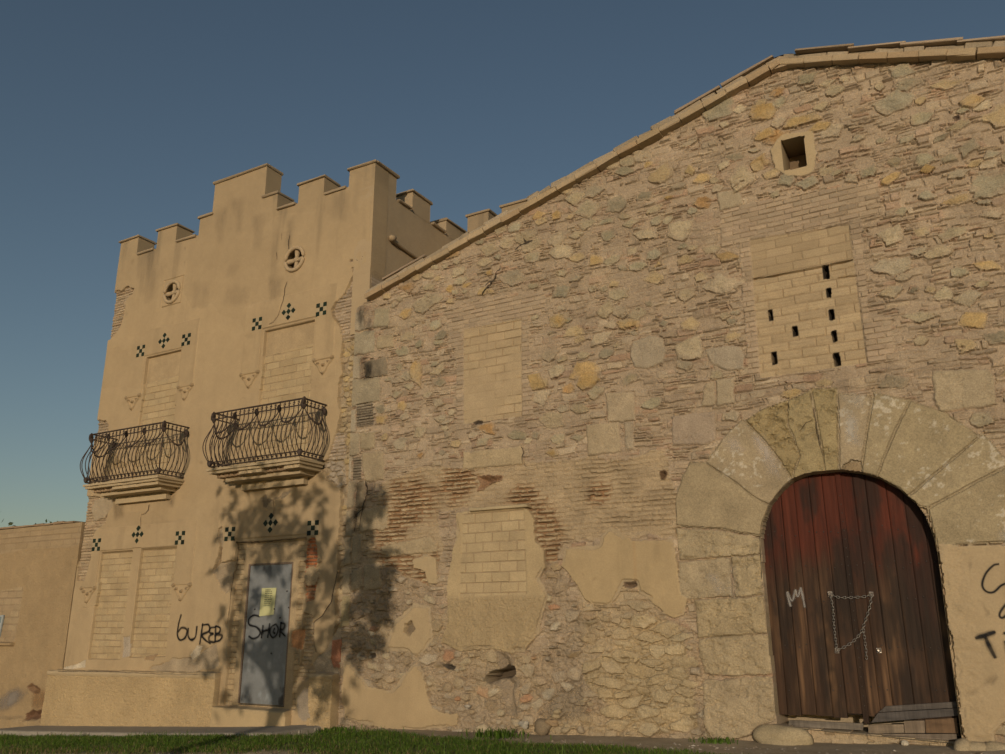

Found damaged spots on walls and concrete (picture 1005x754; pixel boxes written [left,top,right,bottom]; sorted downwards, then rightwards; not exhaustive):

spalling [371,269,385,286]
spalling [111,286,134,338]
spalling [214,527,237,593]
peeling [292,282,460,730]
spalling [368,449,688,617]
peeling [938,542,1005,744]
spalling [489,650,522,715]